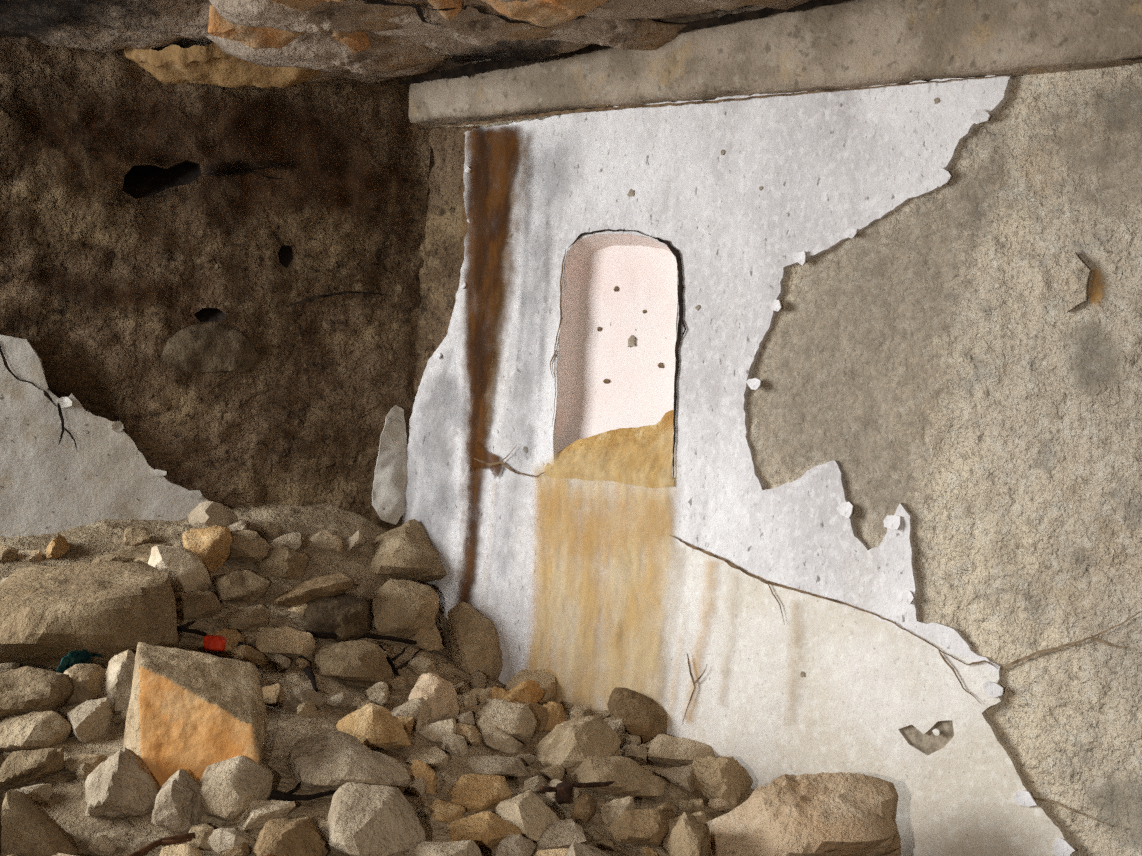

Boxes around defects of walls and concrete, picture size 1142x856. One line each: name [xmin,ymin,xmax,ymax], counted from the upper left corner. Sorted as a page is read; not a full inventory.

spalling [427,0,462,21]
spalling [481,0,607,27]
crack [0,345,77,450]
spalling [0,5,477,537]
corrosion [458,127,529,603]
damp [531,430,673,713]
crack [669,535,1142,704]
spalling [746,63,1142,856]